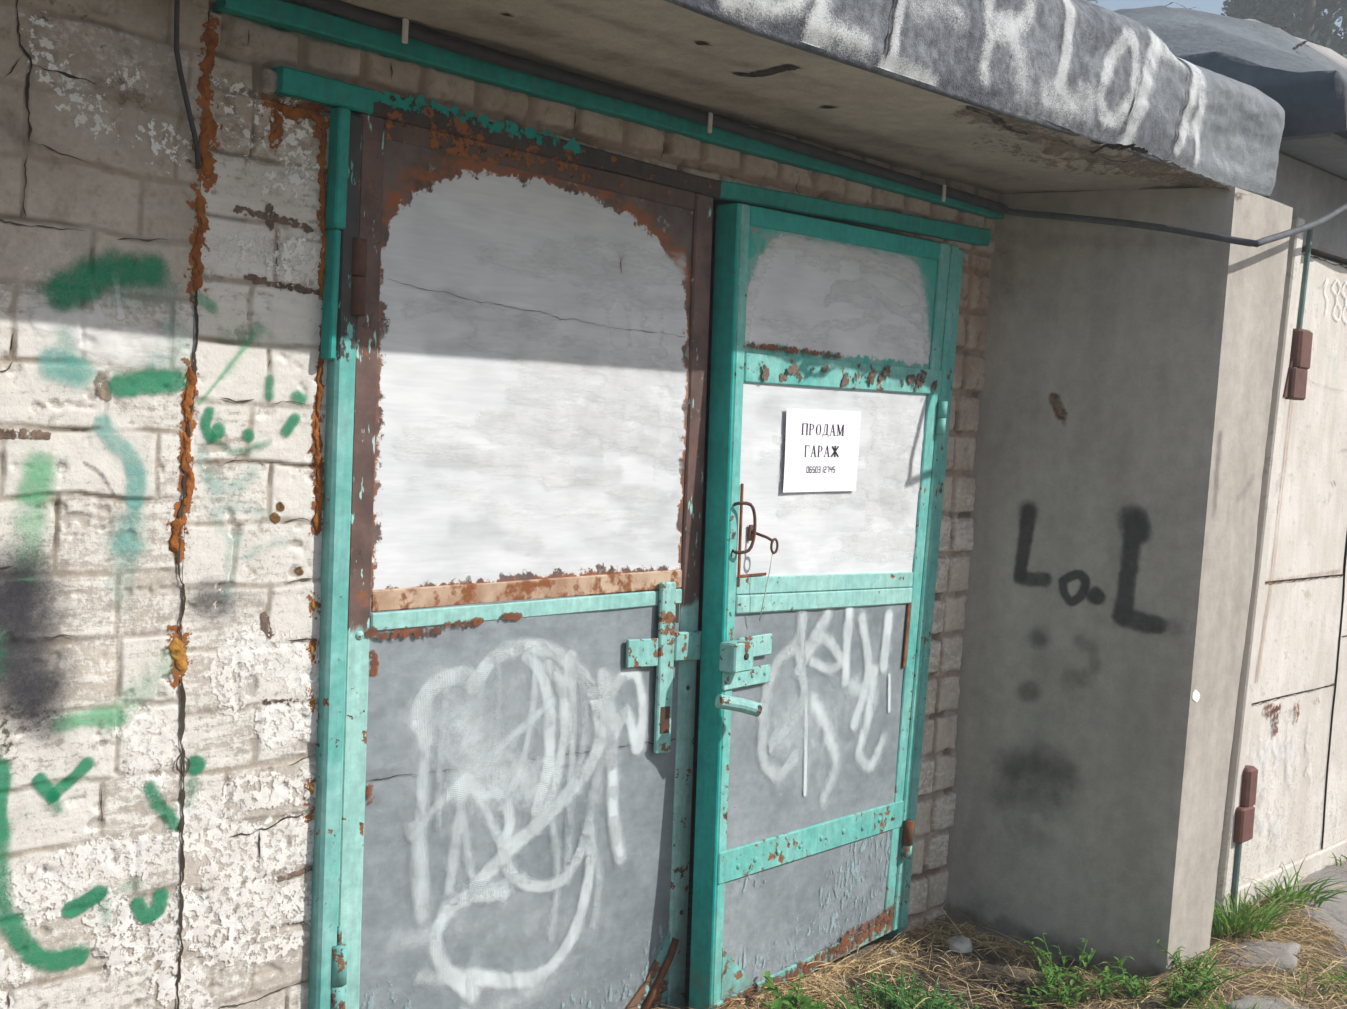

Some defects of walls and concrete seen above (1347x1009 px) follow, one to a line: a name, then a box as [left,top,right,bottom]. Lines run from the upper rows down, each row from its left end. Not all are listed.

crack [0,0,96,231]
peeling [20,0,192,174]
crack [117,201,309,640]
rust [746,341,937,392]
rust [1050,393,1067,420]
rust [365,569,682,676]
crack [176,677,191,1009]
crack [231,813,306,858]
crack [218,981,308,1009]
rust [716,902,896,1009]